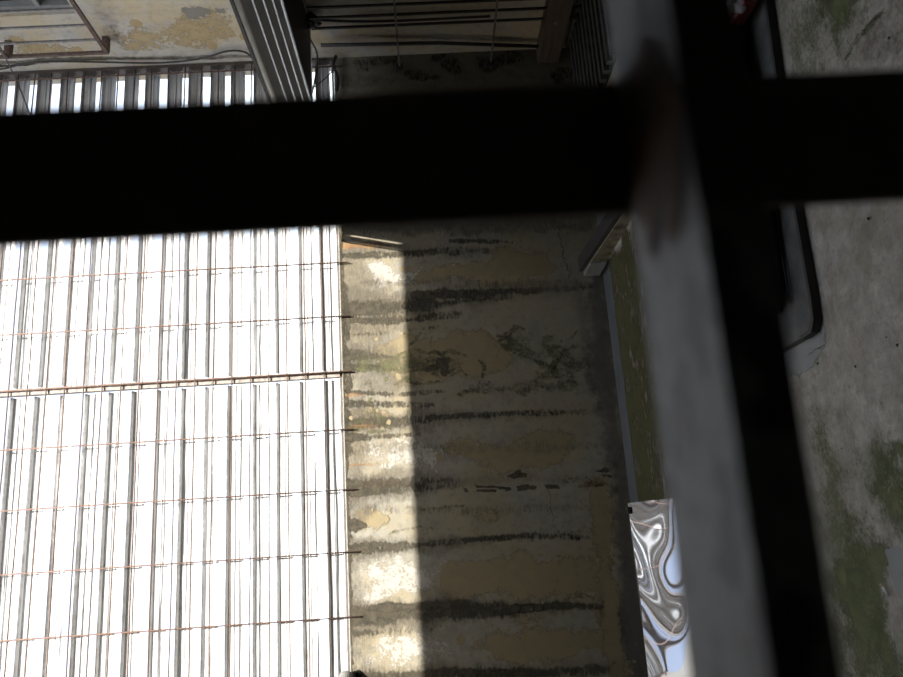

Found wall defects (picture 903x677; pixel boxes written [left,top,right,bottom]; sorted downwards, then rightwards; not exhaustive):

peeling [114,6,244,54]
peeling [372,327,513,387]
peeling [349,407,445,475]
damp [339,225,648,677]
spalling [464,470,559,492]
peeling [354,506,391,531]
peeling [357,552,442,608]
peeling [366,627,457,671]